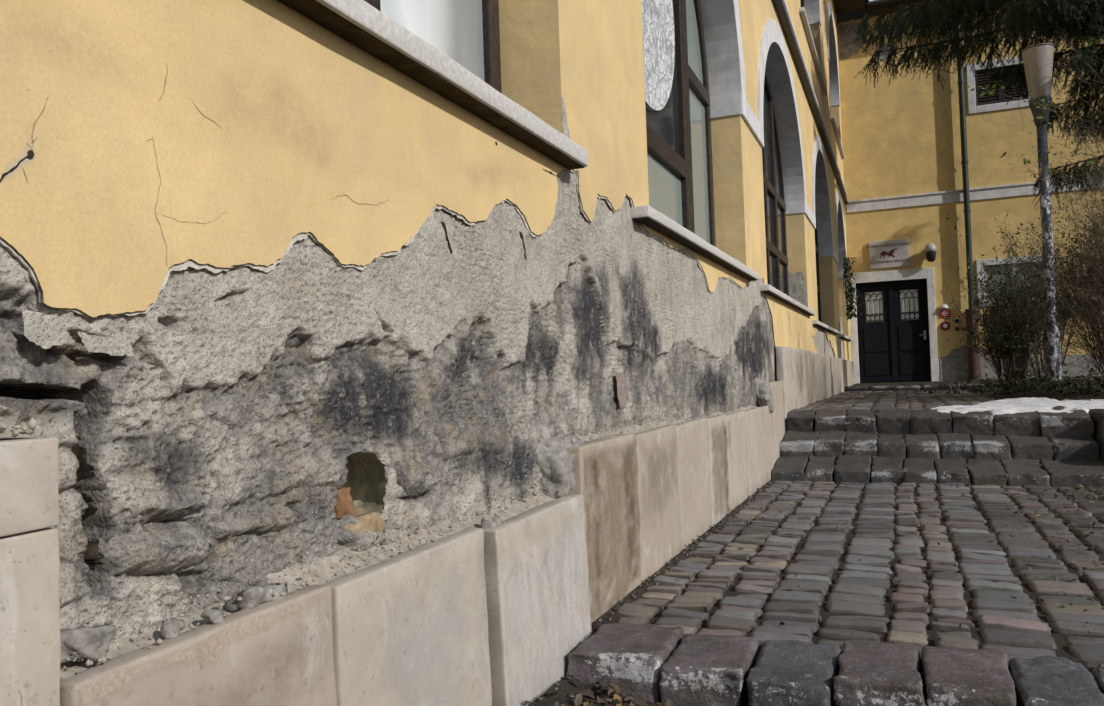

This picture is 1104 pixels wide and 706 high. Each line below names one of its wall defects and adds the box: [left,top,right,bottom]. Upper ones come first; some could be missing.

crack [0,96,49,183]
crack [149,135,228,266]
damp [323,361,409,438]
flaking render [0,170,777,644]
damp [453,332,476,376]
damp [524,336,558,371]
damp [576,274,608,374]
damp [621,267,660,364]
damp [698,371,725,407]
damp [736,323,770,386]
damp [461,444,535,508]